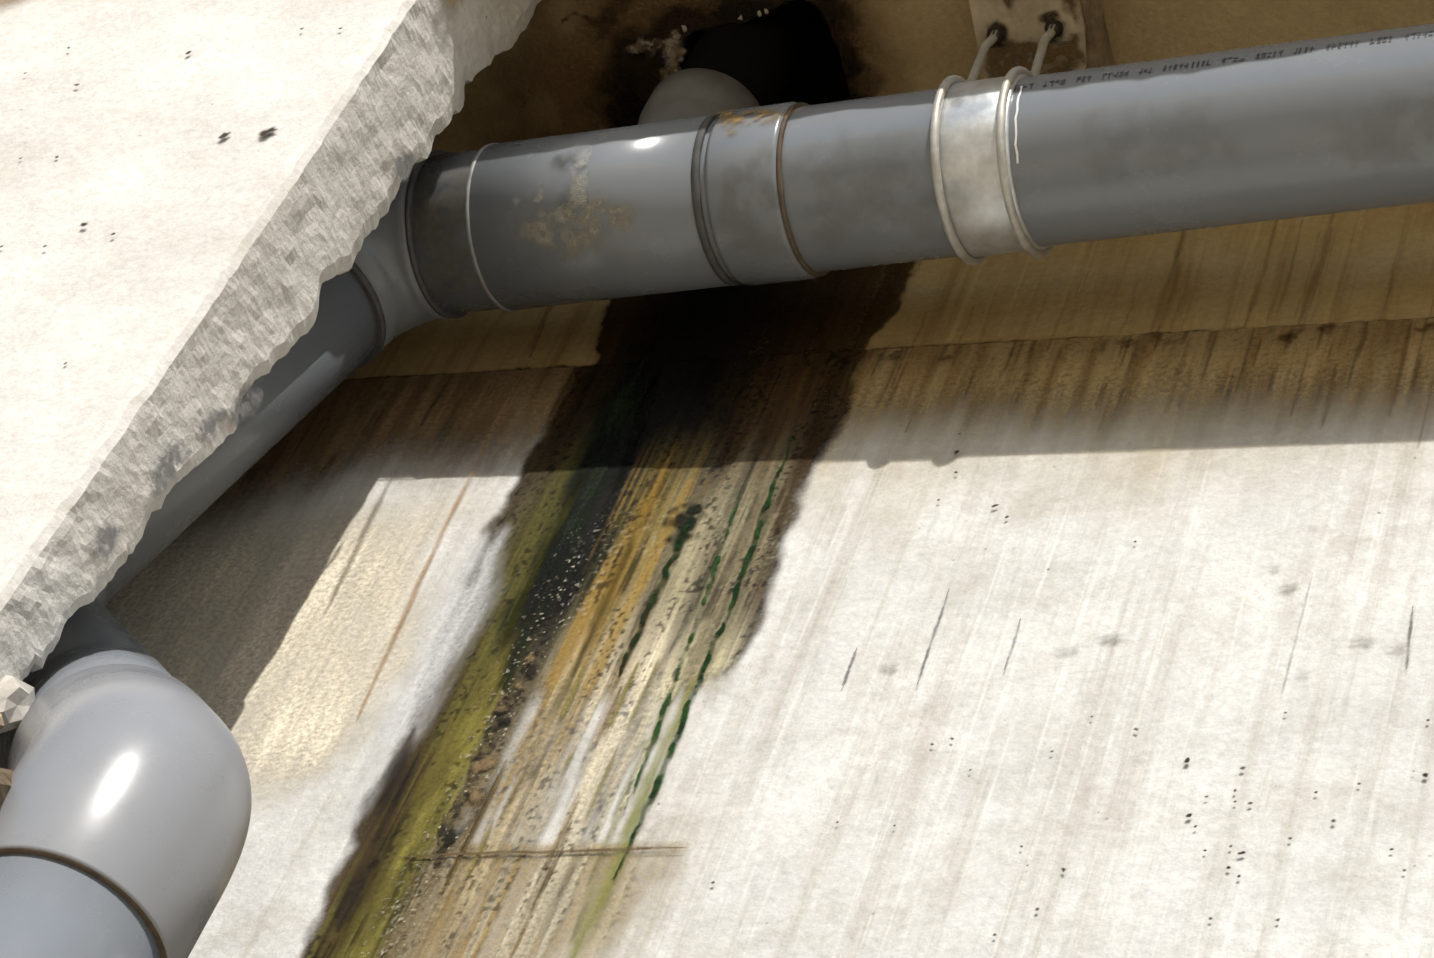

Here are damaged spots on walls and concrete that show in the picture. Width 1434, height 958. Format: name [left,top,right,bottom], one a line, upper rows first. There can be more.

leakage [498,0,786,143]
leakage [809,0,875,100]
leakage [95,526,120,561]
leakage [106,261,1434,958]
spalling [0,675,35,733]